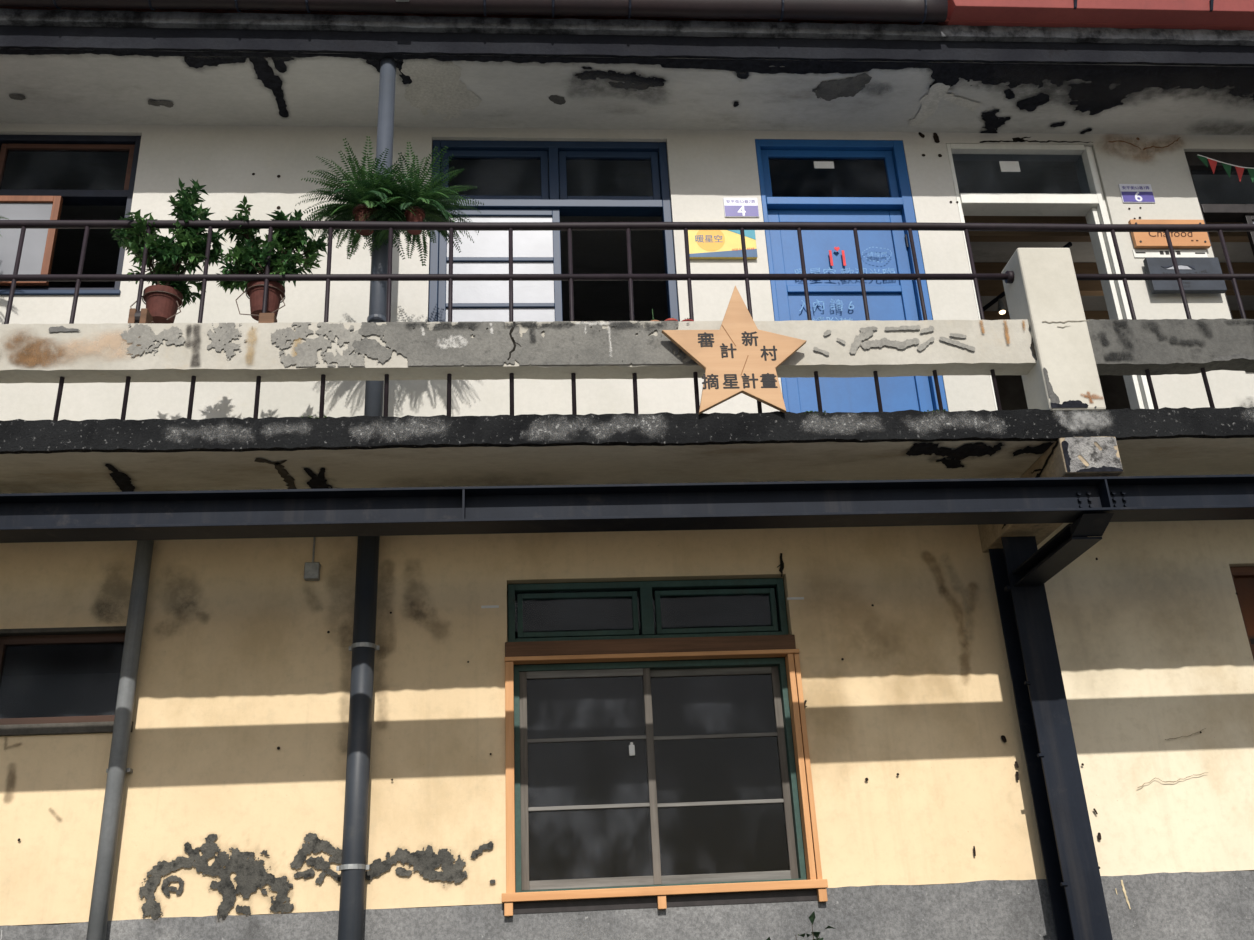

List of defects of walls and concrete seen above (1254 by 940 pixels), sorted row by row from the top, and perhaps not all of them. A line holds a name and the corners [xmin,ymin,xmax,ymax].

flaking render [184,51,294,118]
flaking render [812,73,872,101]
flaking render [1004,89,1050,112]
corrosion [7,335,65,366]
peeling [119,323,185,357]
peeling [207,323,253,359]
peeling [271,321,697,367]
crack [507,322,521,360]
flaking render [105,464,135,492]
crack [1137,773,1204,788]
peeling [139,833,342,921]
peeling [365,841,494,886]